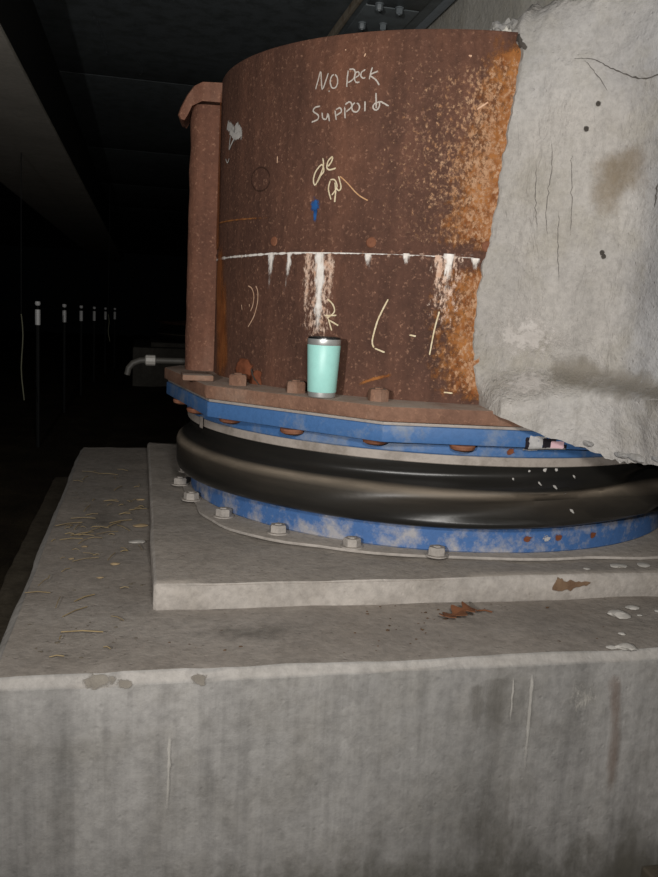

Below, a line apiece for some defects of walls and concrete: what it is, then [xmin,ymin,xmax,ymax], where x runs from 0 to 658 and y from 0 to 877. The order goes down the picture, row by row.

crack [575,58,658,90]
corrosion [410,48,521,250]
corrosion [216,101,256,371]
corrosion [235,358,262,385]
efflorescence [216,252,479,336]
corrosion [430,267,482,400]
spalling [84,674,132,690]
spalling [191,674,206,686]